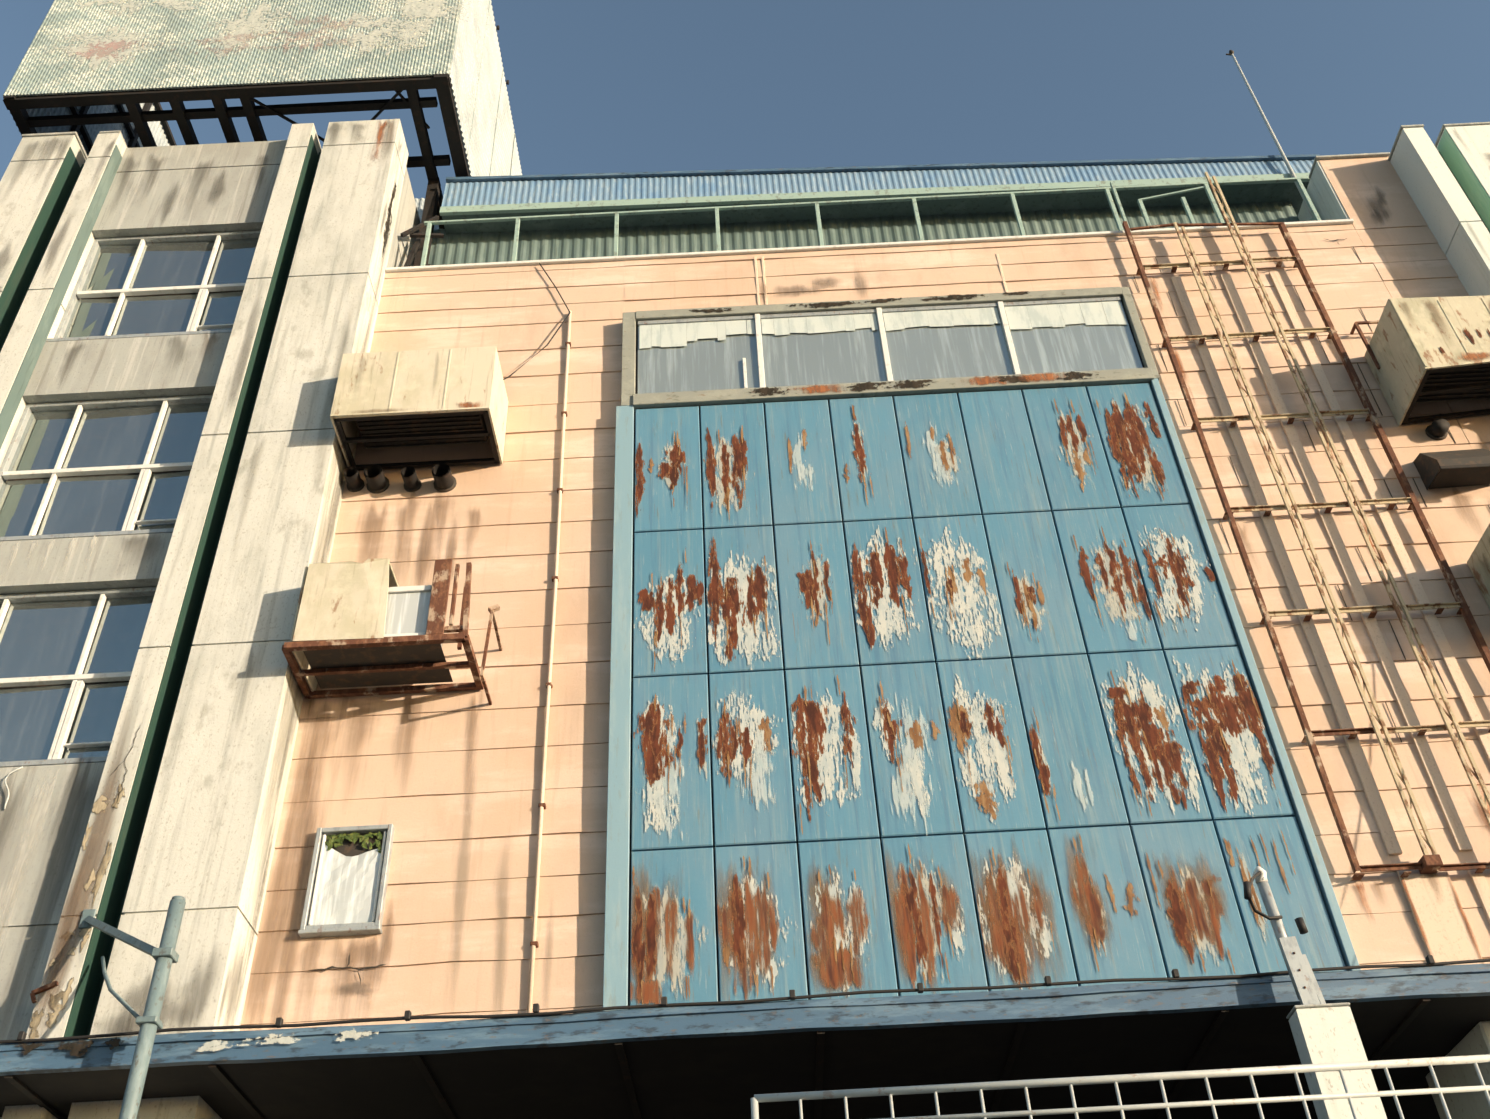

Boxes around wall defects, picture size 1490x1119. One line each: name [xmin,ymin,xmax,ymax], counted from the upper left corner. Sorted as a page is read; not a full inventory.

corrosion [634,537,781,672]
corrosion [850,525,1045,659]
corrosion [1073,526,1215,644]
spalling [84,842,112,908]
spalling [81,780,125,851]
corrosion [630,856,872,1005]
corrosion [633,674,1060,840]
corrosion [887,844,1056,990]
corrosion [1101,656,1281,816]
spalling [29,977,74,1039]
peeling [197,1034,300,1052]
peeling [335,1029,379,1042]